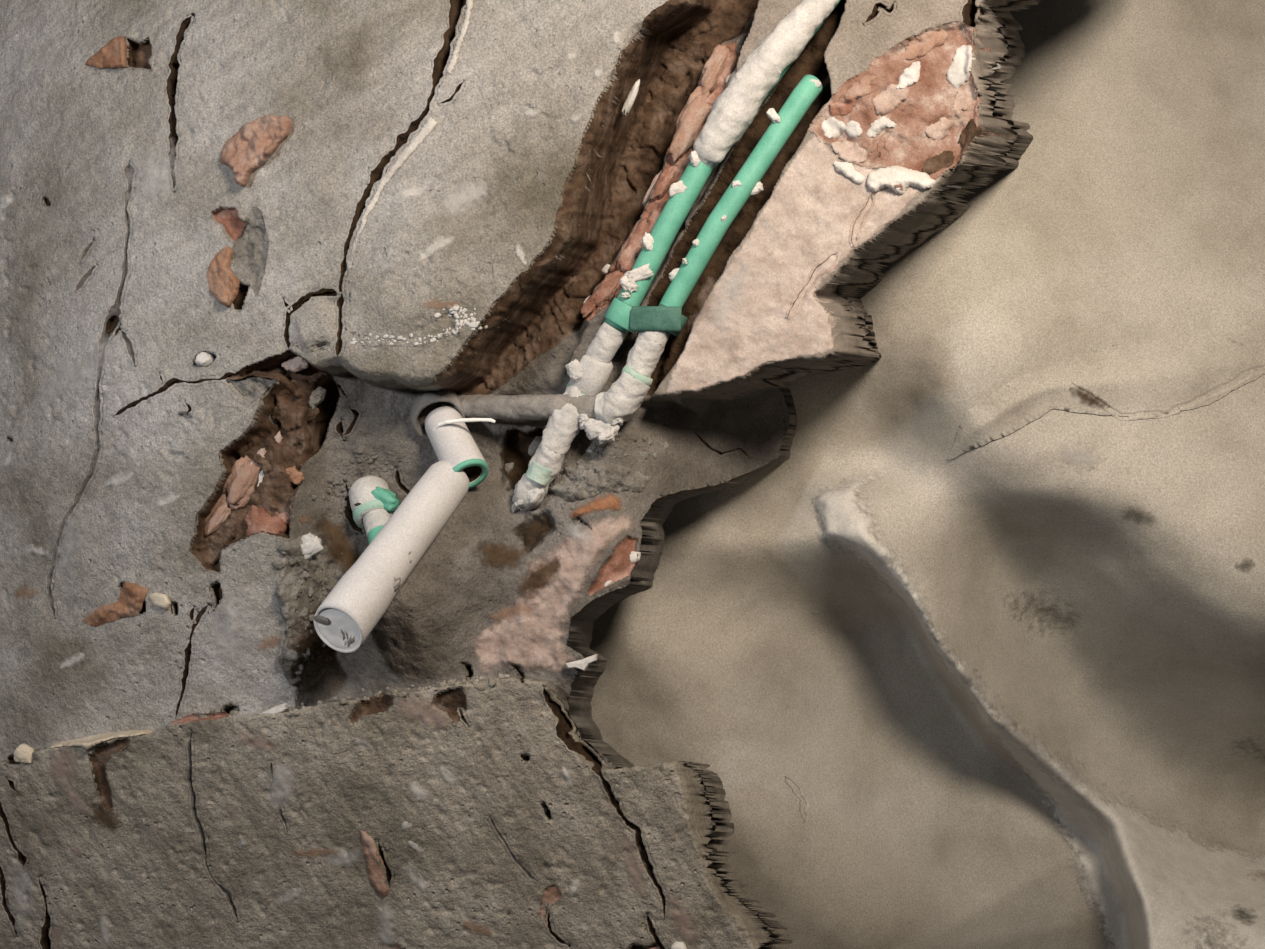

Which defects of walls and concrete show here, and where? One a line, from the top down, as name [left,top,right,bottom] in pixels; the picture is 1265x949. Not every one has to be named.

spalling [220,115,292,187]
crack [45,0,473,619]
spalling [432,0,758,395]
flaking render [667,20,1013,395]
crack [862,0,897,26]
crack [959,0,986,42]
spalling [189,347,347,691]
flaking render [431,458,653,726]
crack [0,777,54,949]
crack [174,603,240,922]
crack [541,686,668,949]